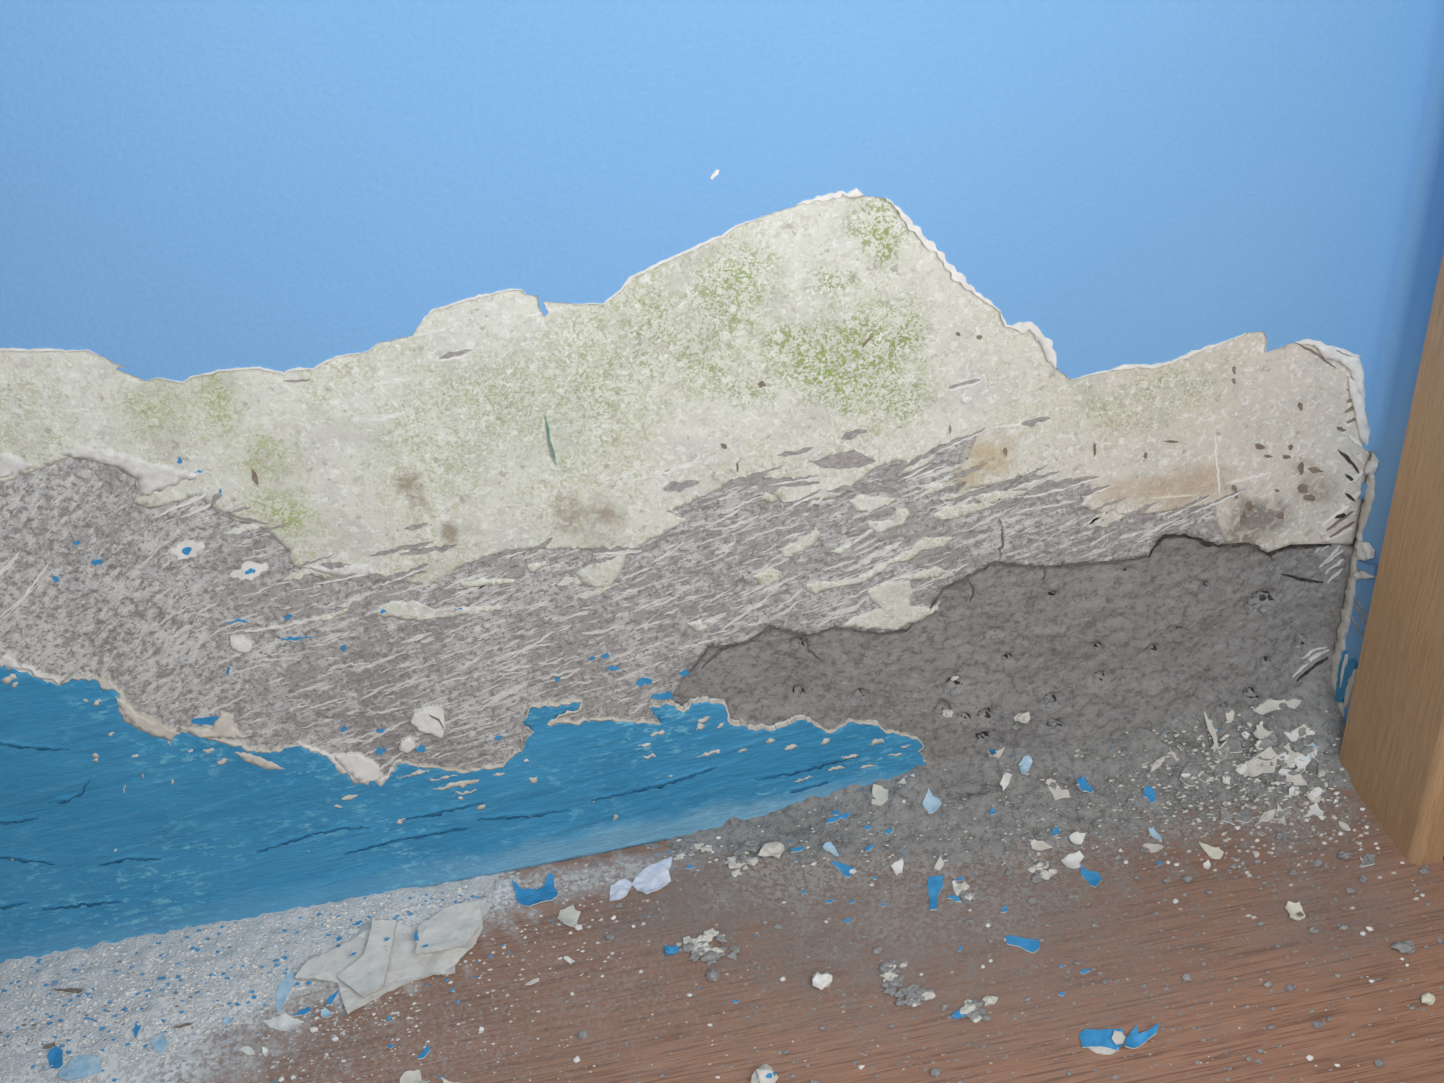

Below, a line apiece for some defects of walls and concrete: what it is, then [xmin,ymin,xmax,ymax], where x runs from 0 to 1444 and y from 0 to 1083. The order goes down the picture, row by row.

damp [861,203,897,260]
damp [713,263,753,306]
damp [781,316,921,412]
peeling [0,188,1378,861]
damp [124,472,1277,770]
crack [689,521,1332,673]
crack [0,738,70,751]
crack [0,776,91,865]
crack [0,854,162,911]